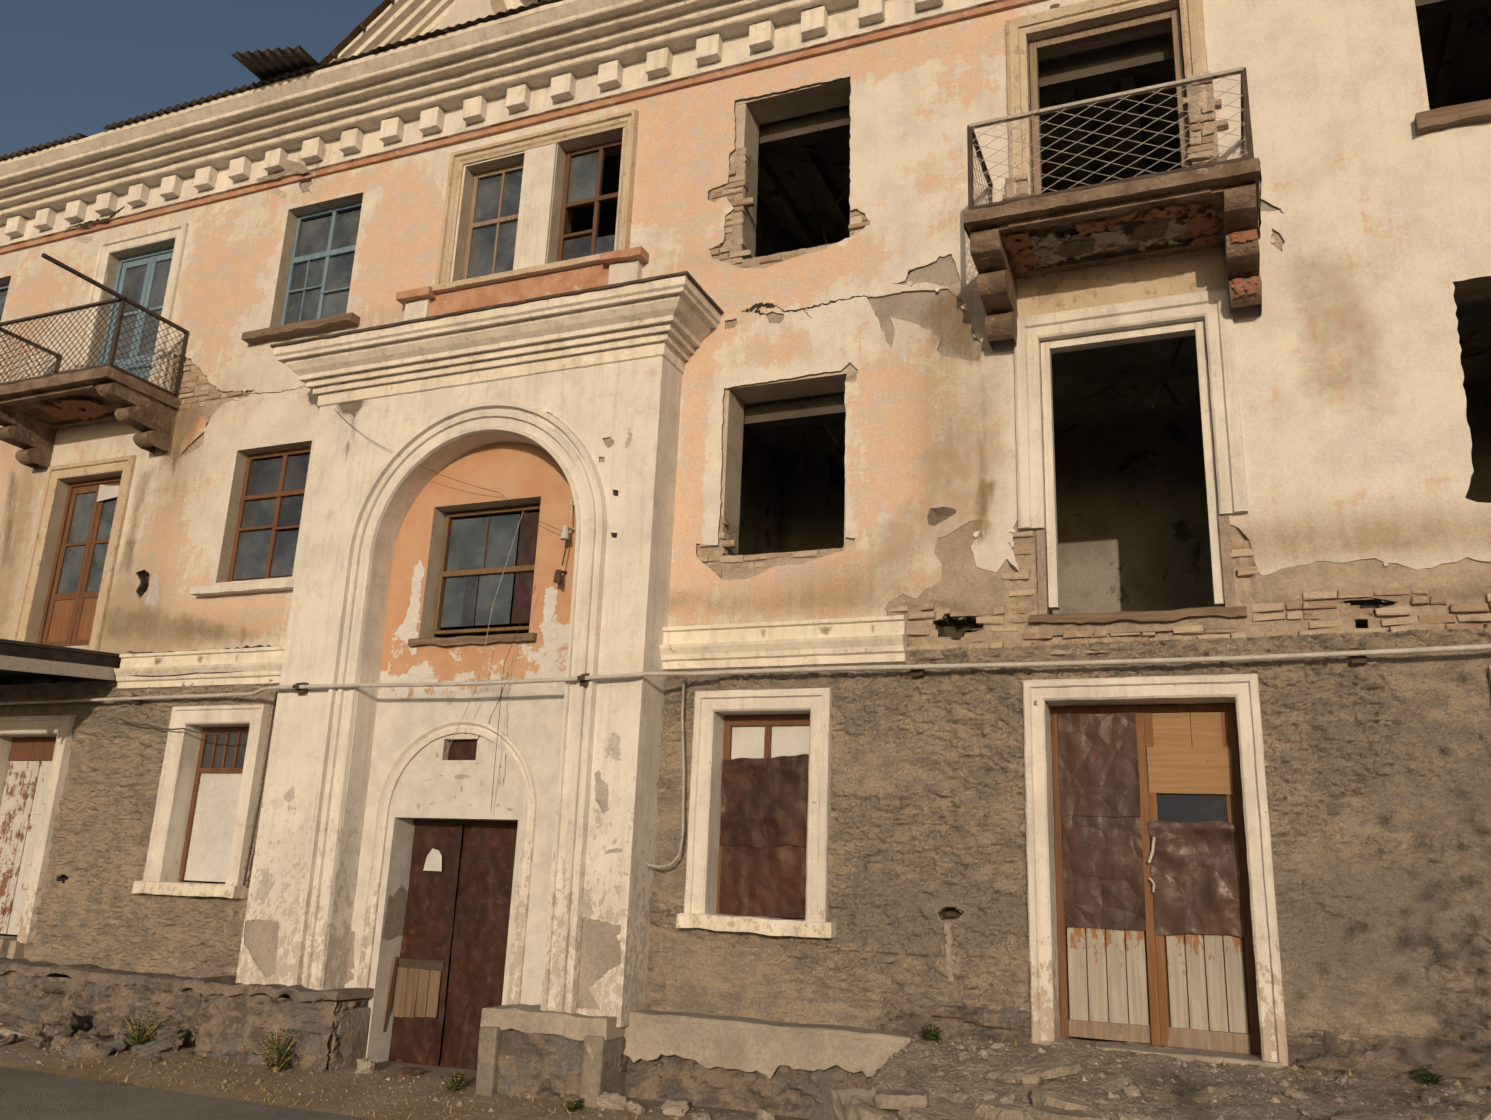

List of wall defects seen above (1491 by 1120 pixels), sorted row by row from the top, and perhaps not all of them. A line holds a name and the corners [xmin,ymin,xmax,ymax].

flaking render [709,150,870,269]
crack [741,295,867,318]
spalling [868,255,984,361]
peeling [1001,200,1288,273]
peeling [1232,276,1260,298]
spalling [166,355,252,459]
peeling [392,560,425,655]
peeling [540,586,558,644]
flaking render [697,517,855,581]
spalling [886,507,1491,660]
spalling [242,868,279,978]
spalling [577,889,627,1009]